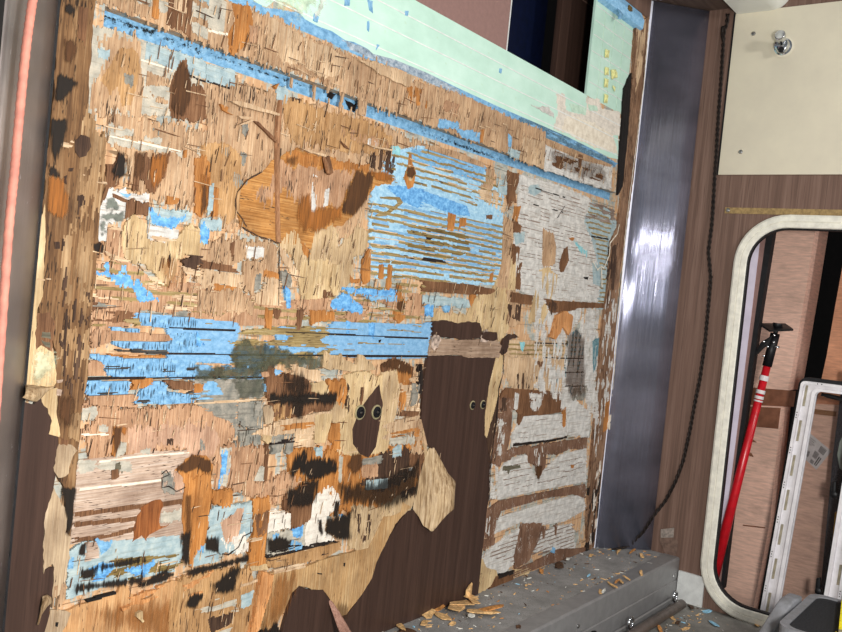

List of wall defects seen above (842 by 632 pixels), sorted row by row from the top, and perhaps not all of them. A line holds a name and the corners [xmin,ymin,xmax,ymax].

peeling [100,47,170,107]
peeling [152,0,193,40]
peeling [228,3,345,80]
peeling [96,181,150,259]
peeling [200,142,242,225]
peeling [256,94,393,210]
peeling [197,241,279,320]
peeling [299,242,340,301]
peeling [413,93,621,589]
peeling [22,379,63,402]
peeling [53,418,220,545]
peeling [329,600,351,632]